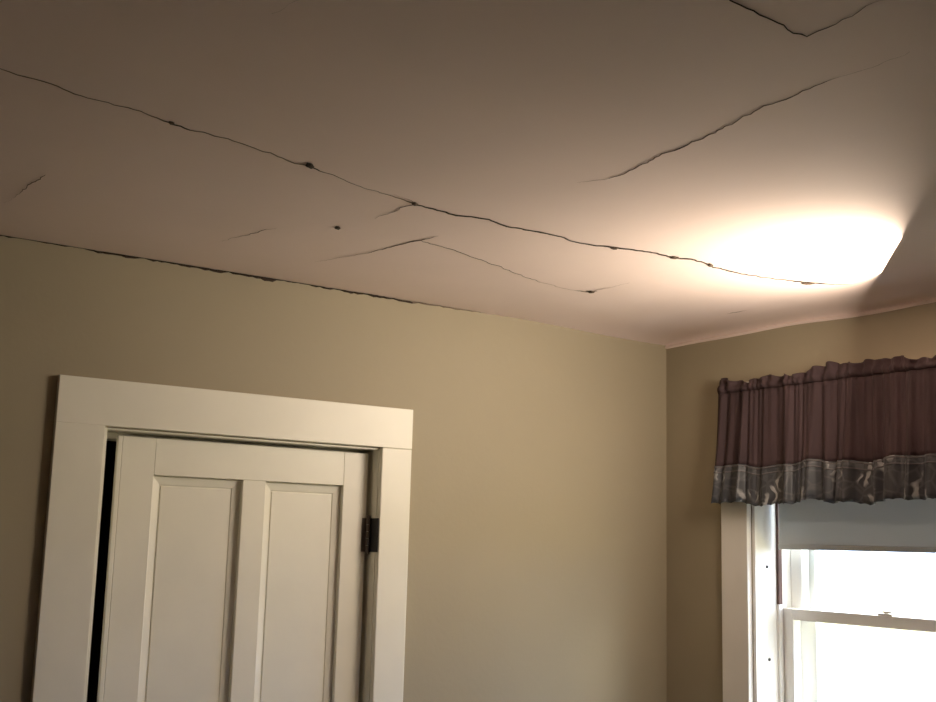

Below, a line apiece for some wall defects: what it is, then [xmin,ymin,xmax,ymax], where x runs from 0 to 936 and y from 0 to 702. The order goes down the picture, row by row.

crack [729,0,881,37]
crack [0,68,848,293]
crack [577,52,909,183]
crack [0,235,504,317]